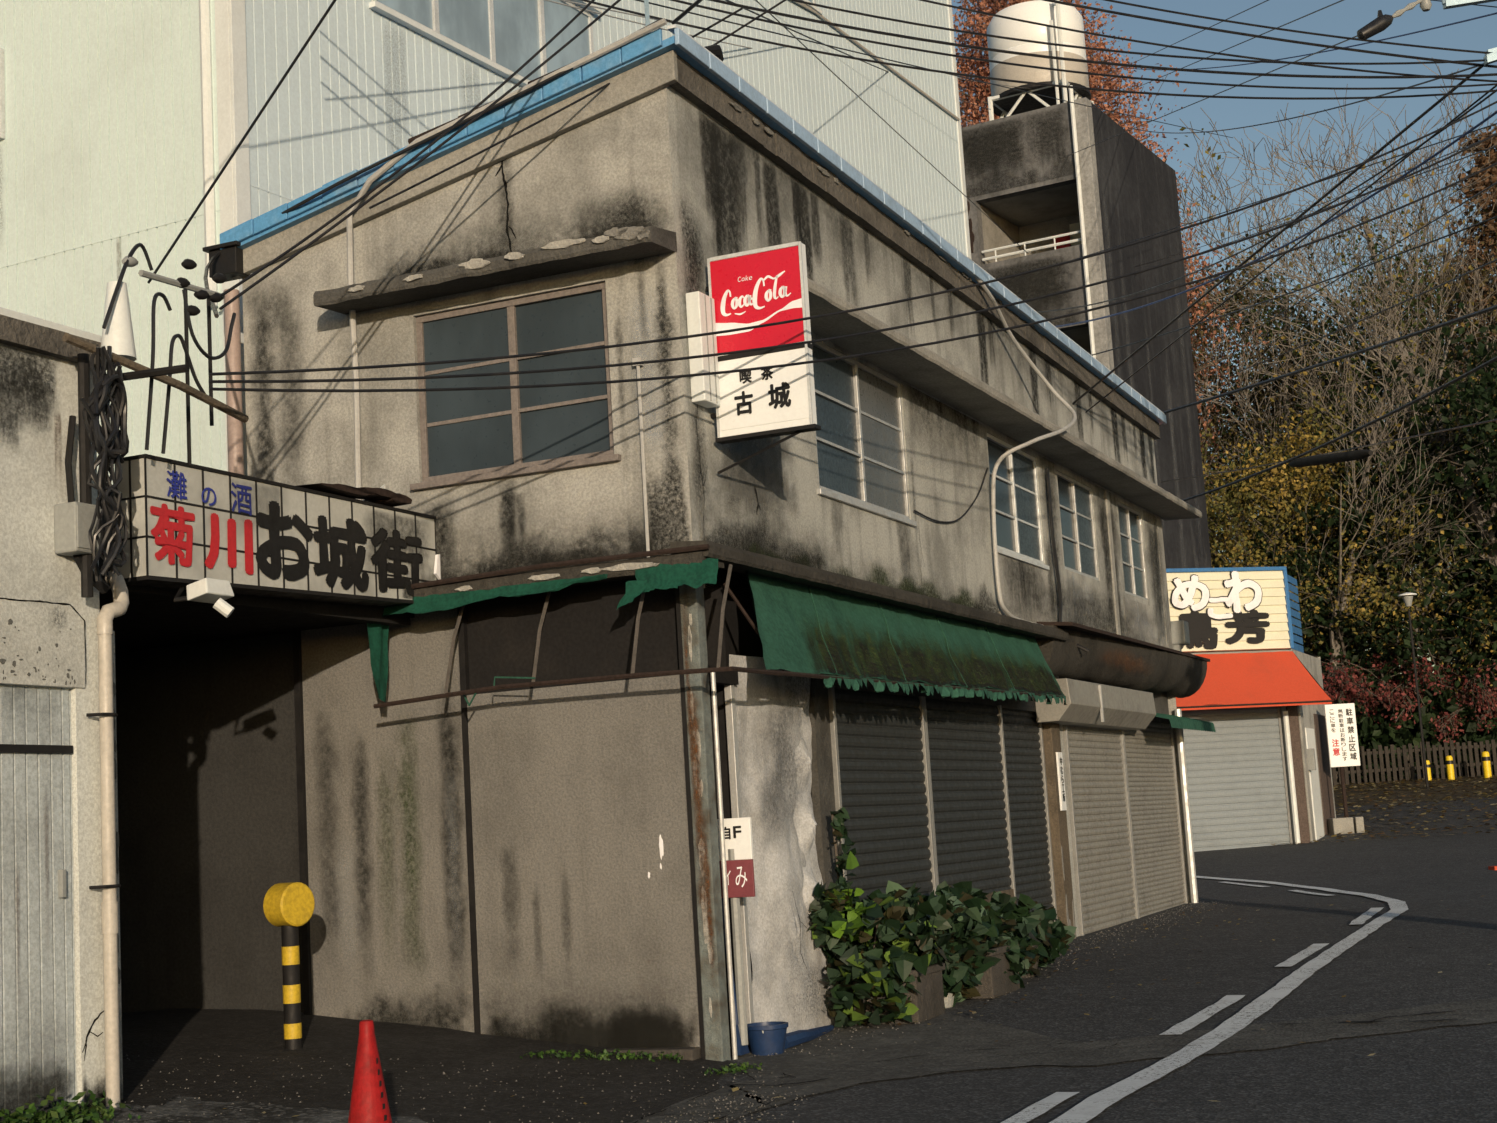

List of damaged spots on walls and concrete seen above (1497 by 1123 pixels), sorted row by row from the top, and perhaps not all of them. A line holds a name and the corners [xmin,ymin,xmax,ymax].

crack [495,161,516,252]
damp [682,118,820,293]
damp [0,347,54,434]
damp [638,286,673,434]
damp [631,438,821,568]
corrosion [685,652,713,945]